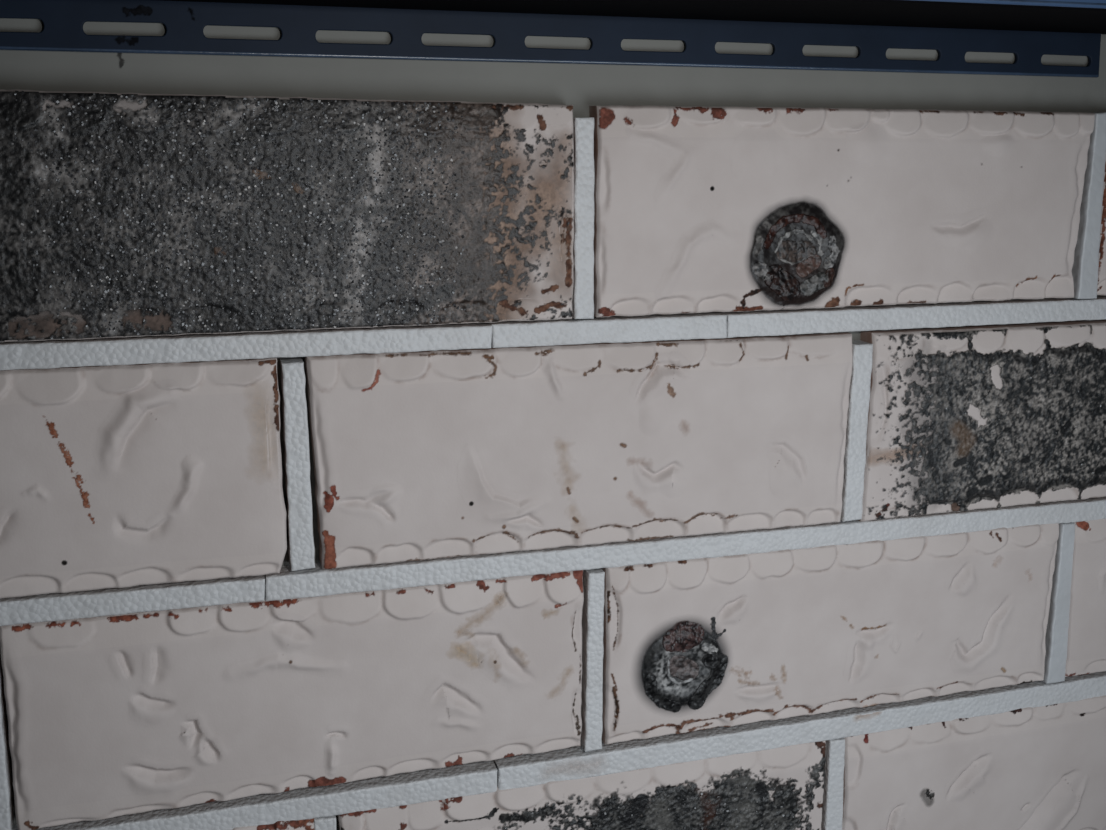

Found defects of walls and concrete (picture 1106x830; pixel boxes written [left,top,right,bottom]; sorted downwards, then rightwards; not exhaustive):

spalling [499,218,573,316]
spalling [621,794,649,827]